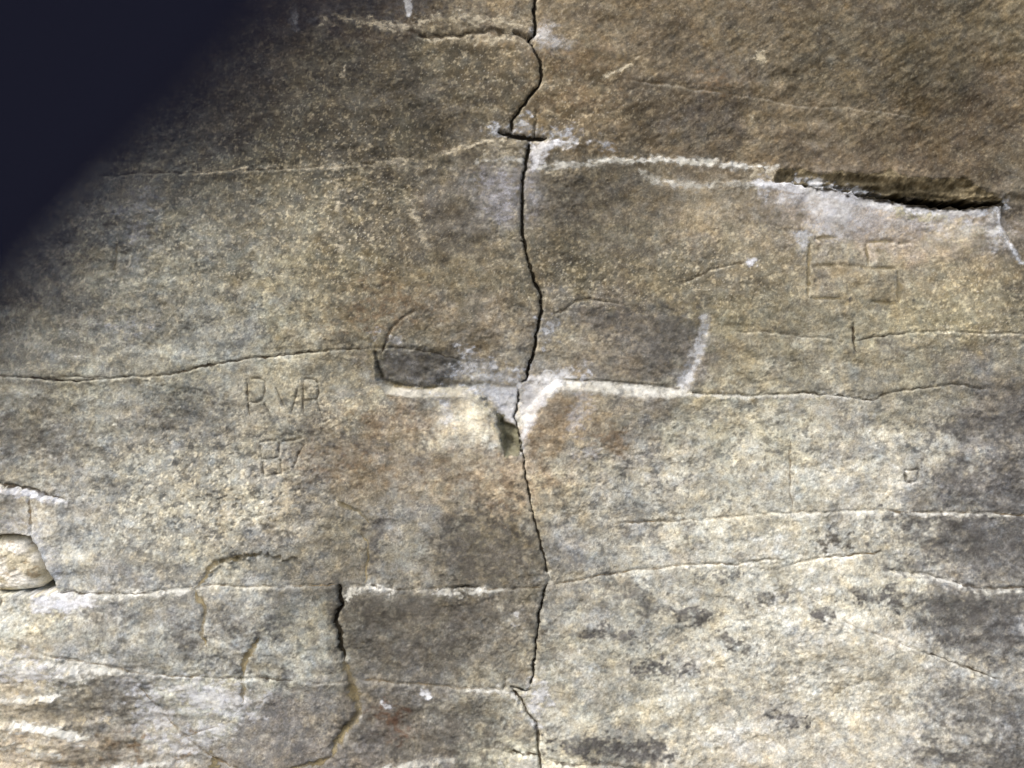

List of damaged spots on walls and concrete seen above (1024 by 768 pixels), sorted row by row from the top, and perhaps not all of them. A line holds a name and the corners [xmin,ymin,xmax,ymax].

crack [33,374,97,382]
crack [178,350,317,374]
crack [404,0,657,768]
crack [292,498,389,768]